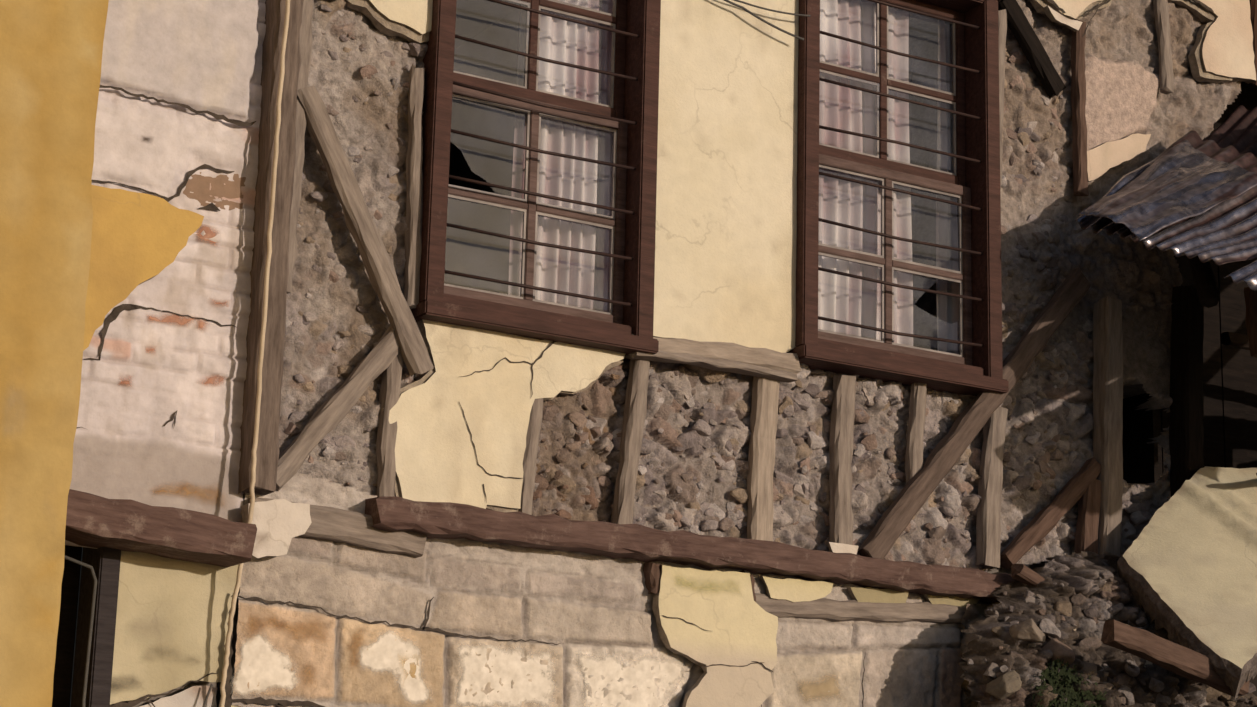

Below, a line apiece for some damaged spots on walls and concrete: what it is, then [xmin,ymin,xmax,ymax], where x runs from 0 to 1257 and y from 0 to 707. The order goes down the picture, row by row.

crack [91,164,234,211]
crack [84,304,236,360]
spalling [1000,0,1257,699]
crack [459,341,555,497]
spalling [633,361,754,539]
spalling [773,363,911,555]
damp [233,635,297,695]
crack [110,595,560,707]
damp [360,631,429,703]
damp [457,645,554,707]
damp [579,655,682,707]
peeling [652,565,981,707]